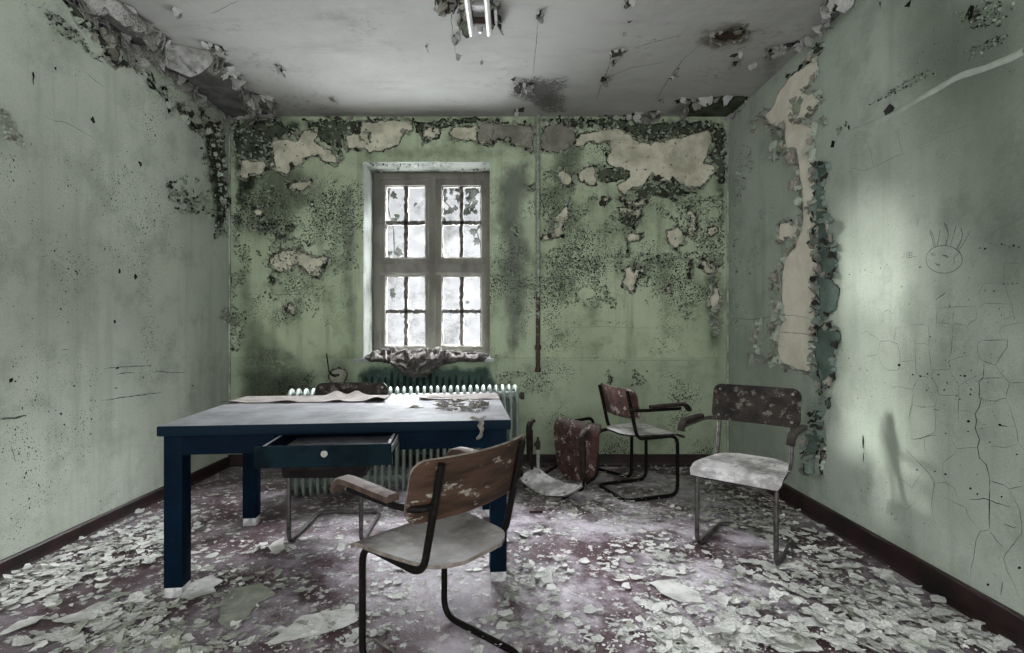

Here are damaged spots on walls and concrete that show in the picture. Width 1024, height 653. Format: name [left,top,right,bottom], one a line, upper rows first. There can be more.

peeling [63,0,748,312]
damp [503,170,523,324]
peeling [729,0,857,479]
crack [862,261,1023,594]